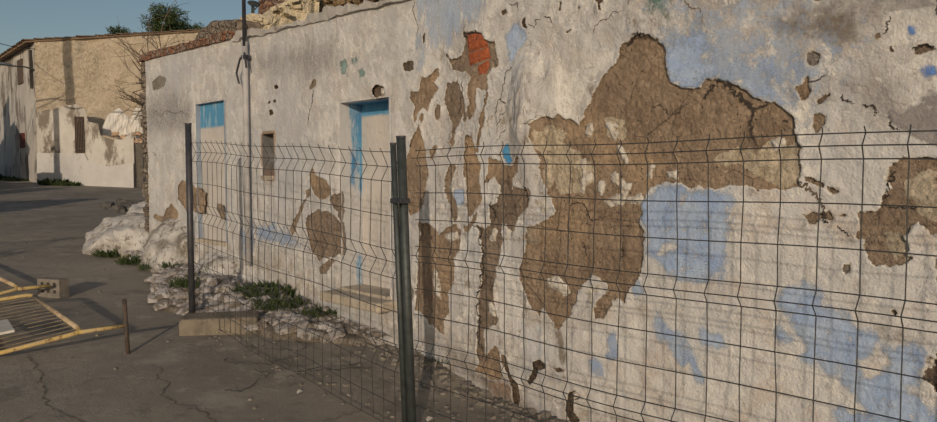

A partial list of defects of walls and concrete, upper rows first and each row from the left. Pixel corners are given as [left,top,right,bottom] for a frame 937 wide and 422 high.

peeling [889,93,937,144]
spalling [242,169,345,274]
spalling [406,17,839,405]
spalling [802,211,846,225]
spalling [856,157,937,267]
peeling [776,281,937,422]